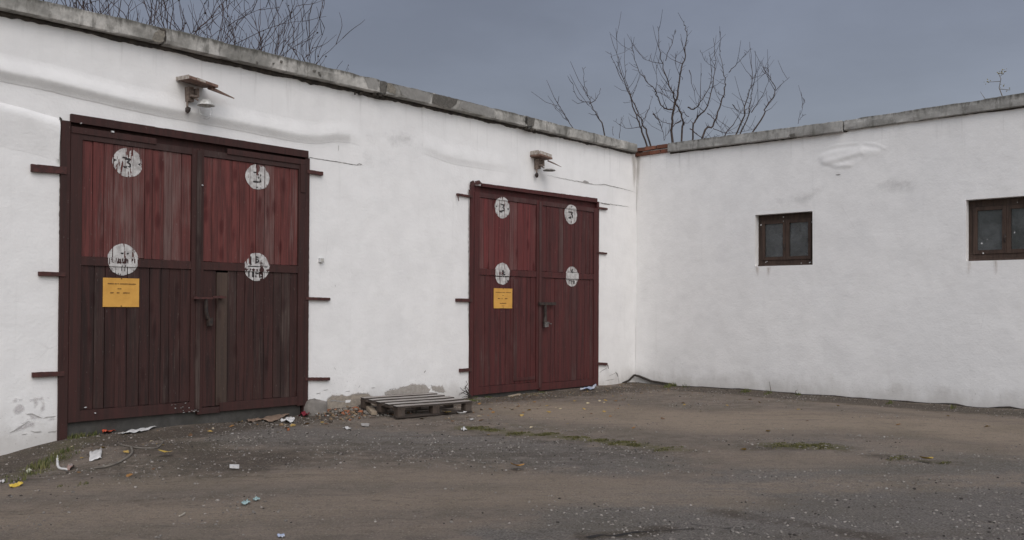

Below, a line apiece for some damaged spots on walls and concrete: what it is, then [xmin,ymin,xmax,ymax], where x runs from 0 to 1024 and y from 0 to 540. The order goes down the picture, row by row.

flaking render [385,384,445,395]
flaking render [327,393,375,411]